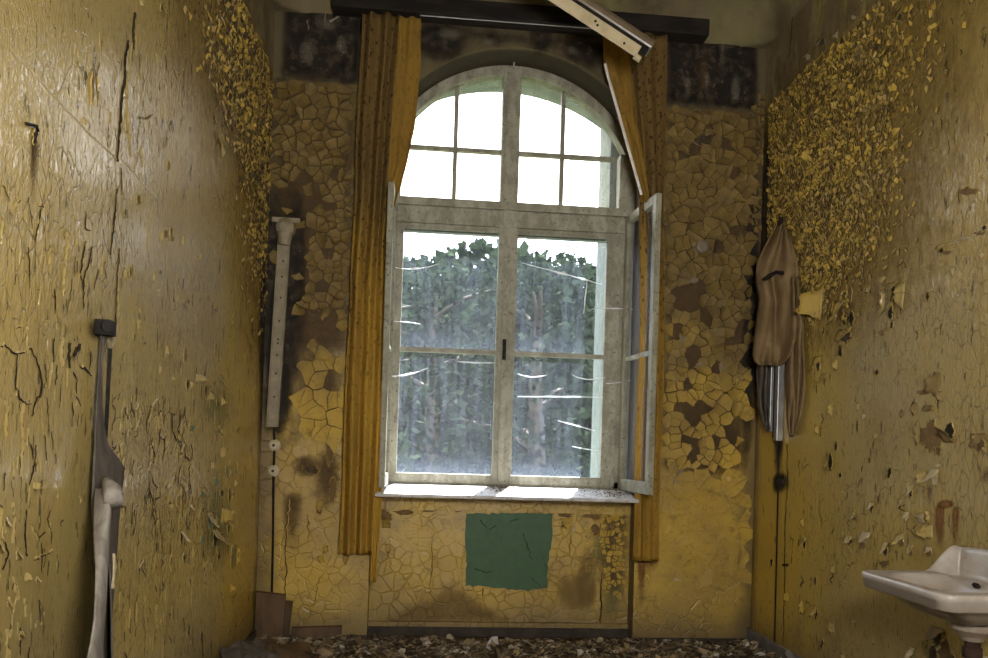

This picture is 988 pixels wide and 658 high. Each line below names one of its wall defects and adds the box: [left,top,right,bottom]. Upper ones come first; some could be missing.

crack [0,12,256,658]
peeling [159,342,231,406]
peeling [183,0,358,516]
peeling [661,0,975,485]
peeling [878,371,956,567]
crack [597,575,605,623]
peeling [903,625,956,658]